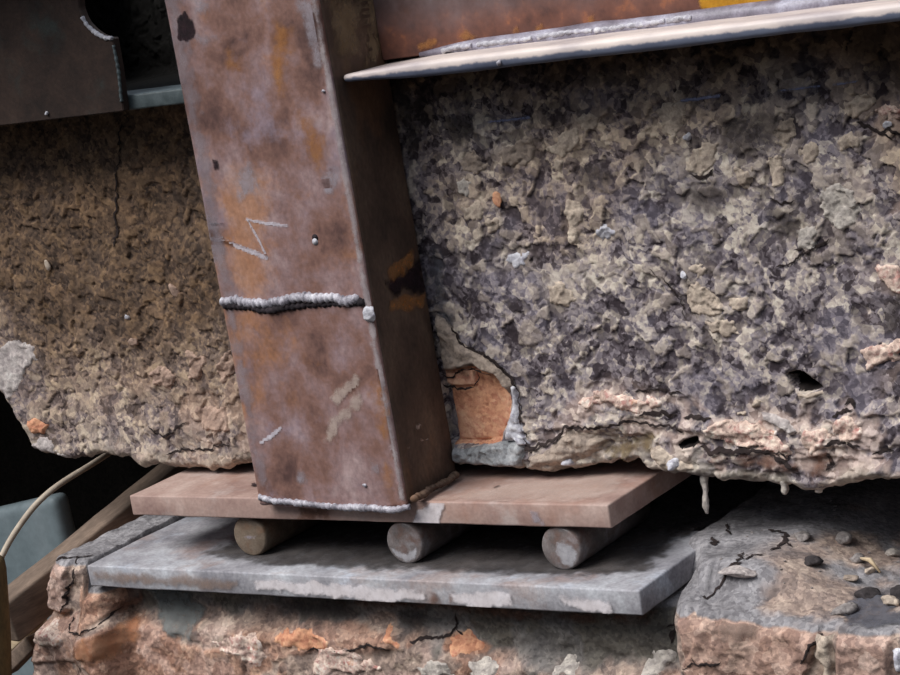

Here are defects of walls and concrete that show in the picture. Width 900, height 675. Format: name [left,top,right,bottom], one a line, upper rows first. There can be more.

crack [113,124,122,247]
spalling [434,311,530,467]
crack [832,398,855,418]
crack [699,445,792,470]
crack [823,440,894,471]
crack [56,554,123,636]
crack [306,613,463,652]
crack [702,523,793,599]